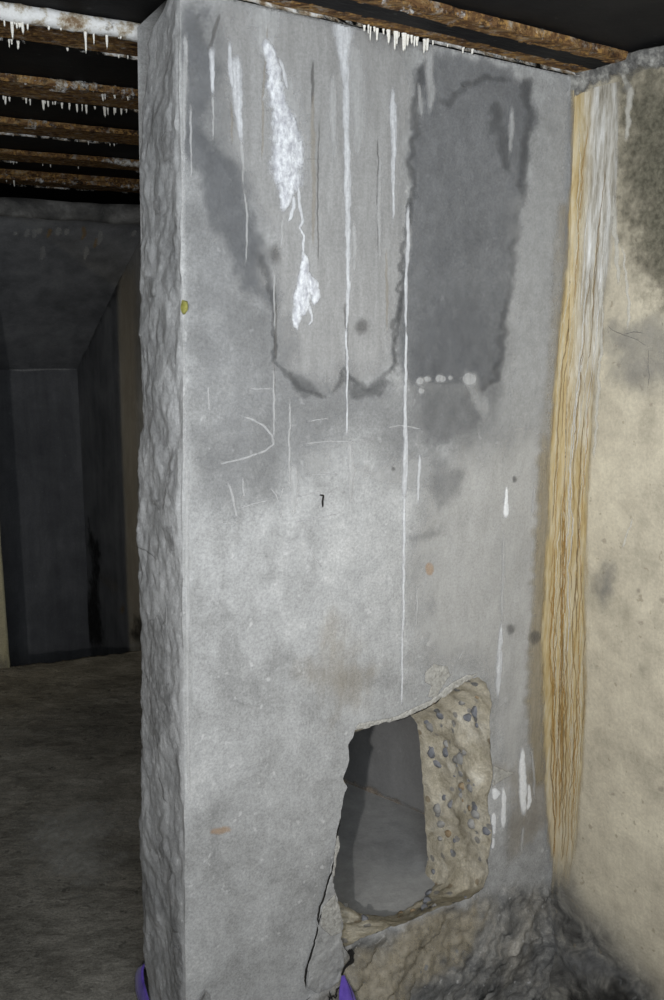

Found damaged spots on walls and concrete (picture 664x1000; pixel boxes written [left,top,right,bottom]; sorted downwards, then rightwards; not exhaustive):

water stain [183,0,664,703]
water stain [421,206,566,813]
crack [304,821,355,1000]
spalling [307,664,493,1000]
water stain [491,788,506,849]